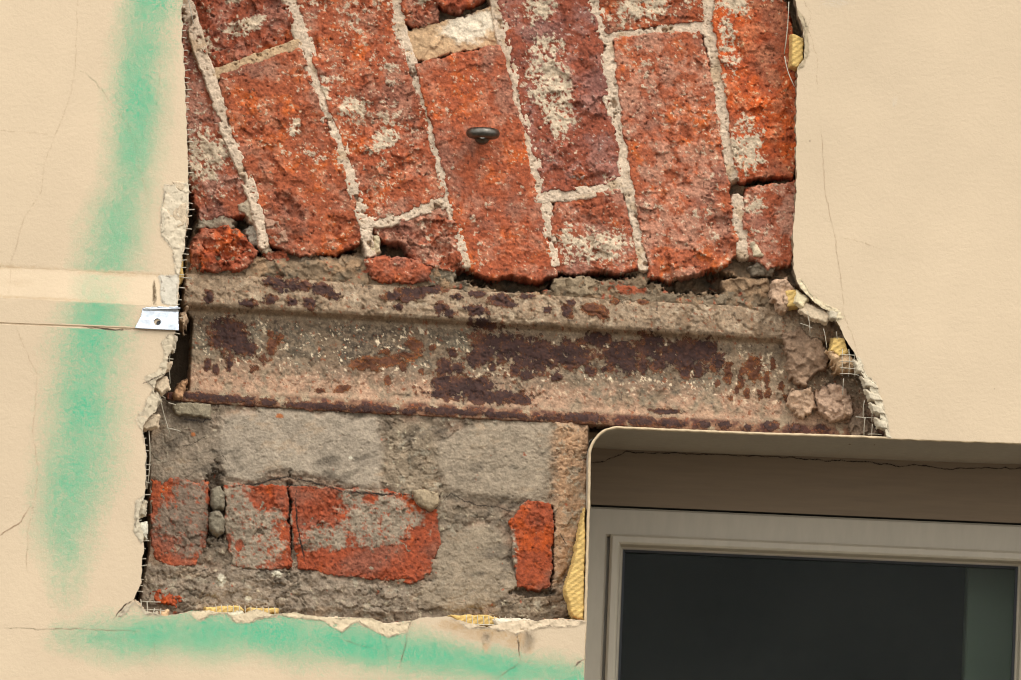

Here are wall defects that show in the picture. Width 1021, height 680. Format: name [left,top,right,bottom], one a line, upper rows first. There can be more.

spalling [797,8,810,69]
spalling [158,181,189,306]
spalling [793,278,844,325]
spalling [135,332,212,443]
spalling [852,357,892,438]
spalling [133,494,148,543]
spalling [118,599,169,617]
spalling [453,618,586,636]